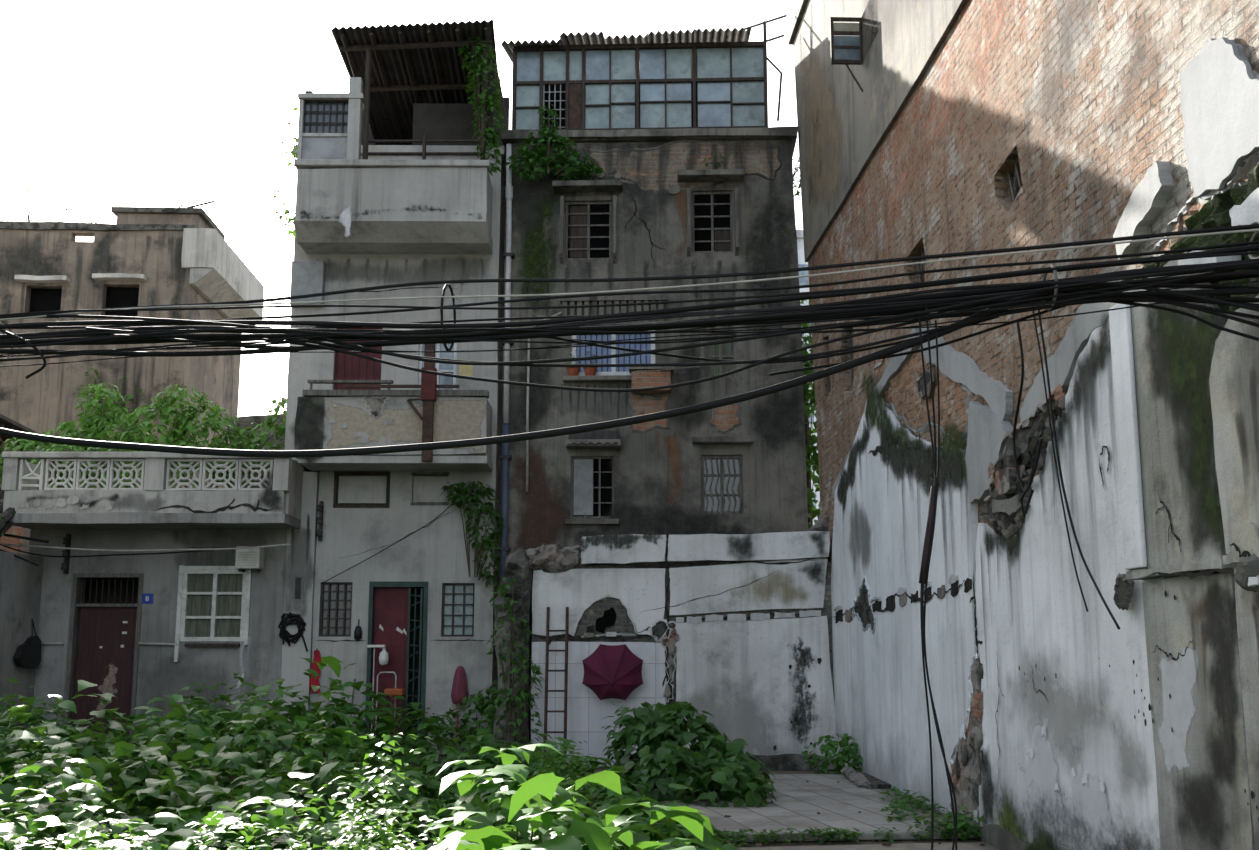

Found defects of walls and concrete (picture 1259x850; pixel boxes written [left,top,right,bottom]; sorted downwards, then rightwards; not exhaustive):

crack [625,185,663,265]
spalling [1153,163,1259,308]
crack [157,498,274,513]
peeling [325,396,486,450]
damp [837,423,968,563]
damp [981,524,1023,612]
spalling [980,384,1065,539]
damp [1147,302,1227,555]
spalling [573,595,680,703]
damp [790,640,815,742]
spalling [947,652,985,828]
peeling [1133,647,1198,772]